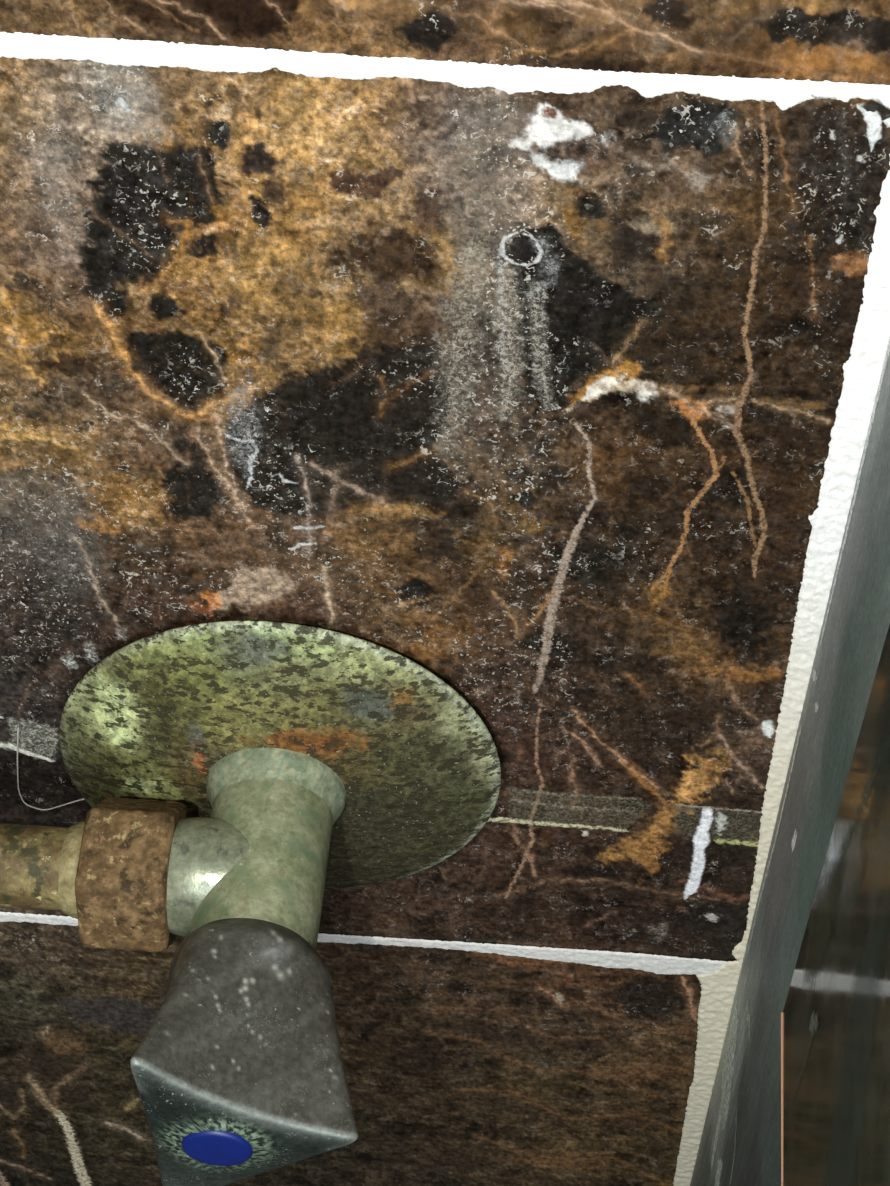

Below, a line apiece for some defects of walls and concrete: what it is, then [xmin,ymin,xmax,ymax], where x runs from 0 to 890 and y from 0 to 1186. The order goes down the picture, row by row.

water stain [496,232,558,409]